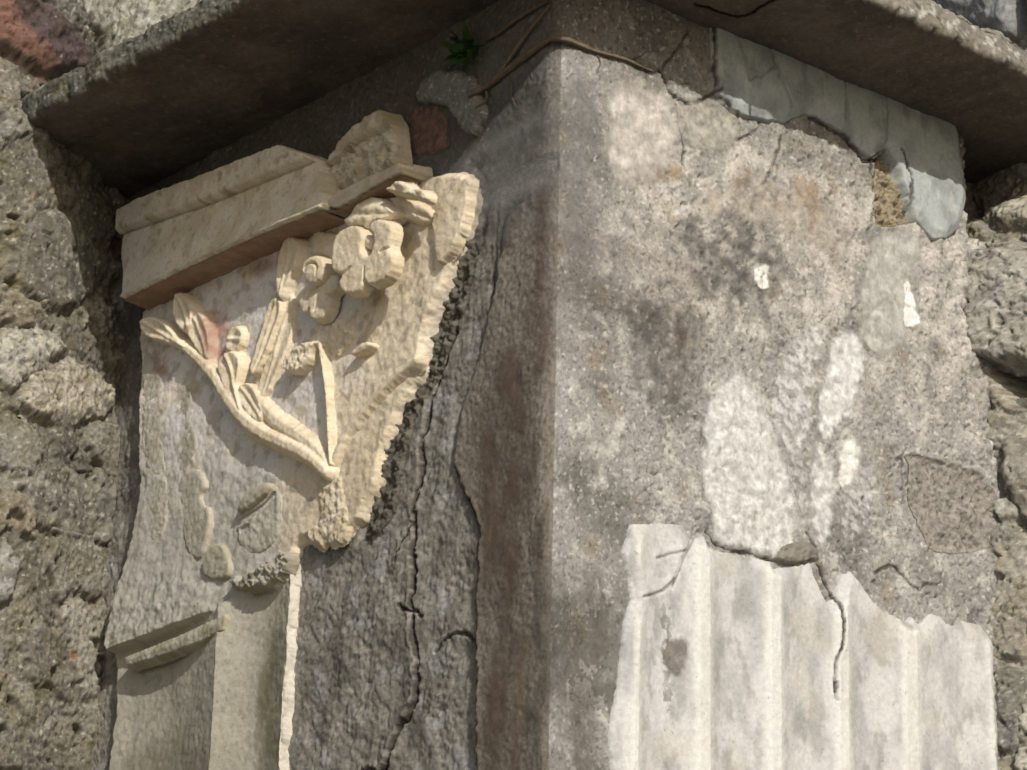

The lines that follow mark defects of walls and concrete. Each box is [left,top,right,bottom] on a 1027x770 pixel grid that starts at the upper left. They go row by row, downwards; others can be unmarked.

crack [658,0,777,140]
crack [808,117,875,212]
spalling [363,237,479,544]
crack [368,329,481,770]
crack [710,539,778,560]
crack [810,542,846,693]
crack [874,565,930,588]